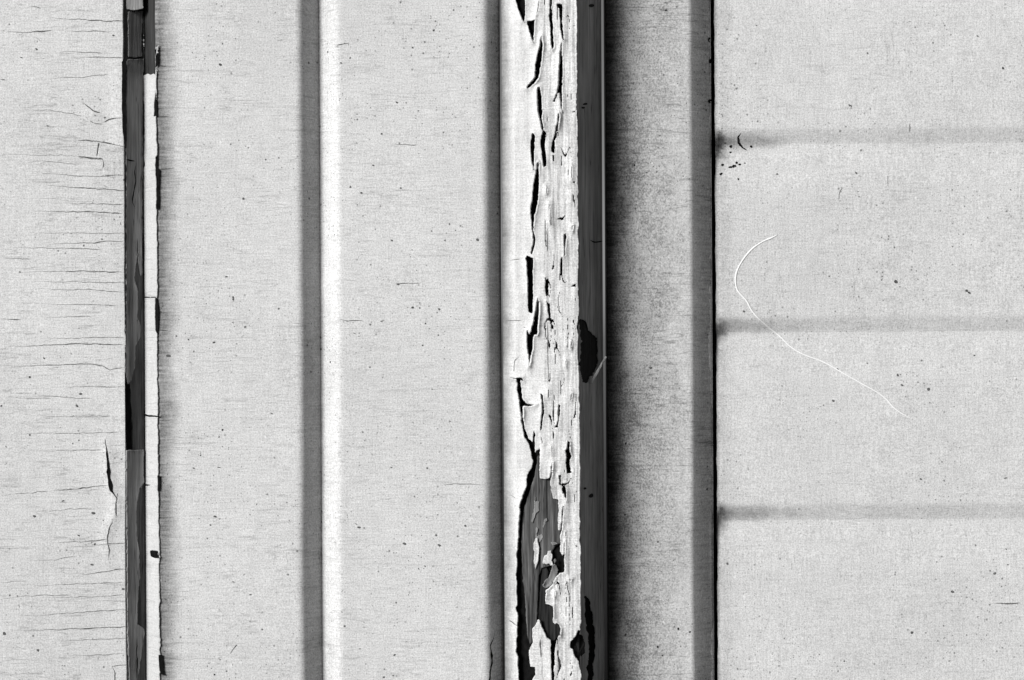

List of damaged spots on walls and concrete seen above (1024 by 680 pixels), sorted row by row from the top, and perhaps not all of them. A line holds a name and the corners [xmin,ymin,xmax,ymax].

crack [1,104,156,680]
peeling [578,319,607,384]
peeling [521,455,562,680]
spalling [570,629,587,663]